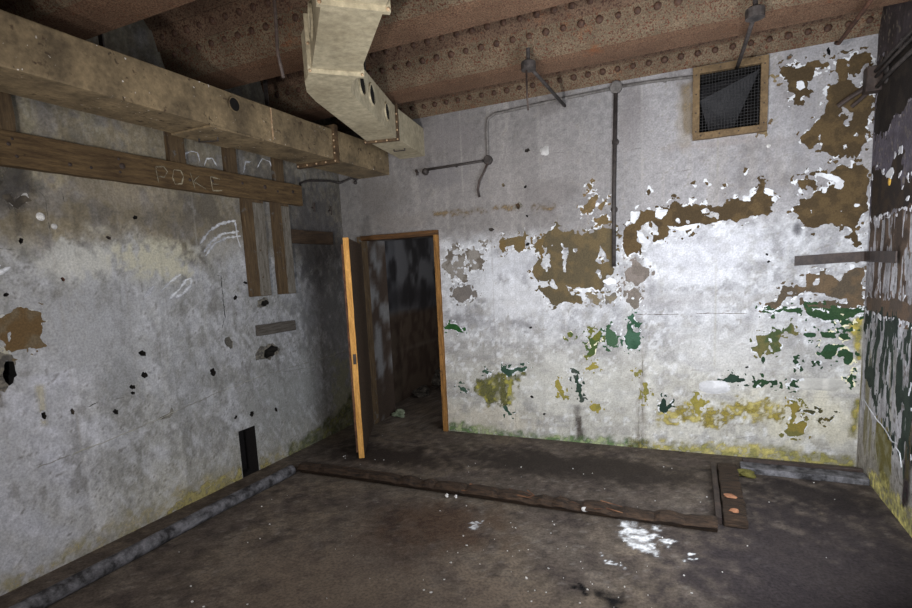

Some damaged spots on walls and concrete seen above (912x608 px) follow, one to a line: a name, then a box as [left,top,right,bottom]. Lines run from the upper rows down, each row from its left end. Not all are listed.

peeling [0,303,48,392]
peeling [441,167,781,419]
peeling [717,35,912,498]